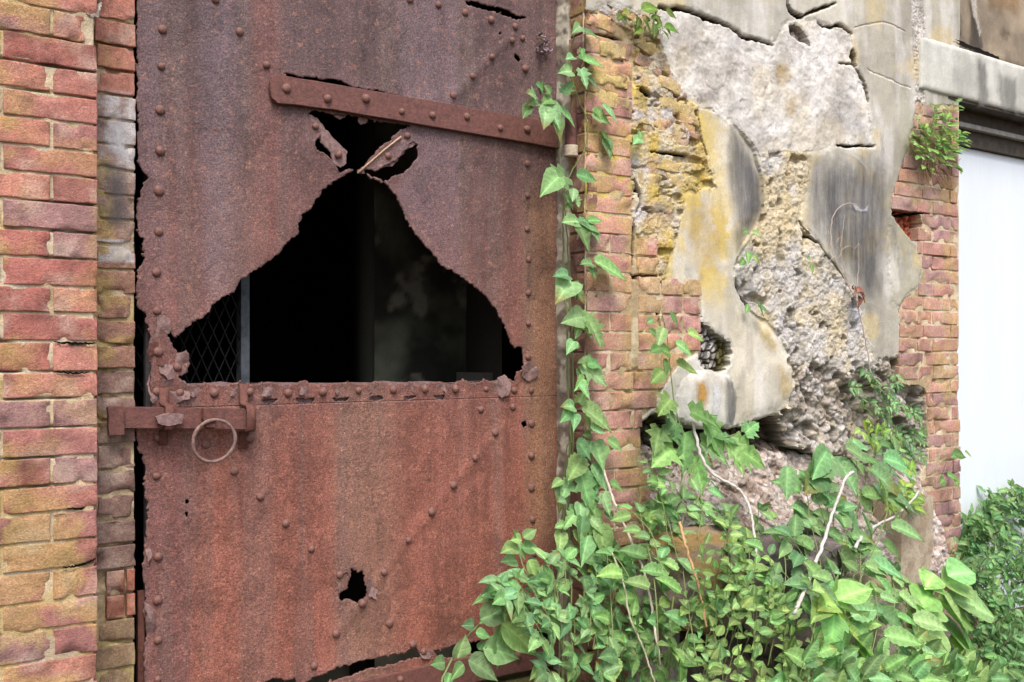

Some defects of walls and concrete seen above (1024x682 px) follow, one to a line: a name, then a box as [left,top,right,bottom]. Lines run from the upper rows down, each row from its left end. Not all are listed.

crack [653,5,774,46]
crack [786,0,911,103]
crack [650,109,708,157]
crack [836,141,875,149]
water stain [816,169,878,290]
flaking render [578,0,928,575]
corrosion [146,314,203,426]
corrosion [495,362,539,398]
spalling [928,510,950,579]
corrosion [366,579,378,599]
corrosion [144,603,156,634]